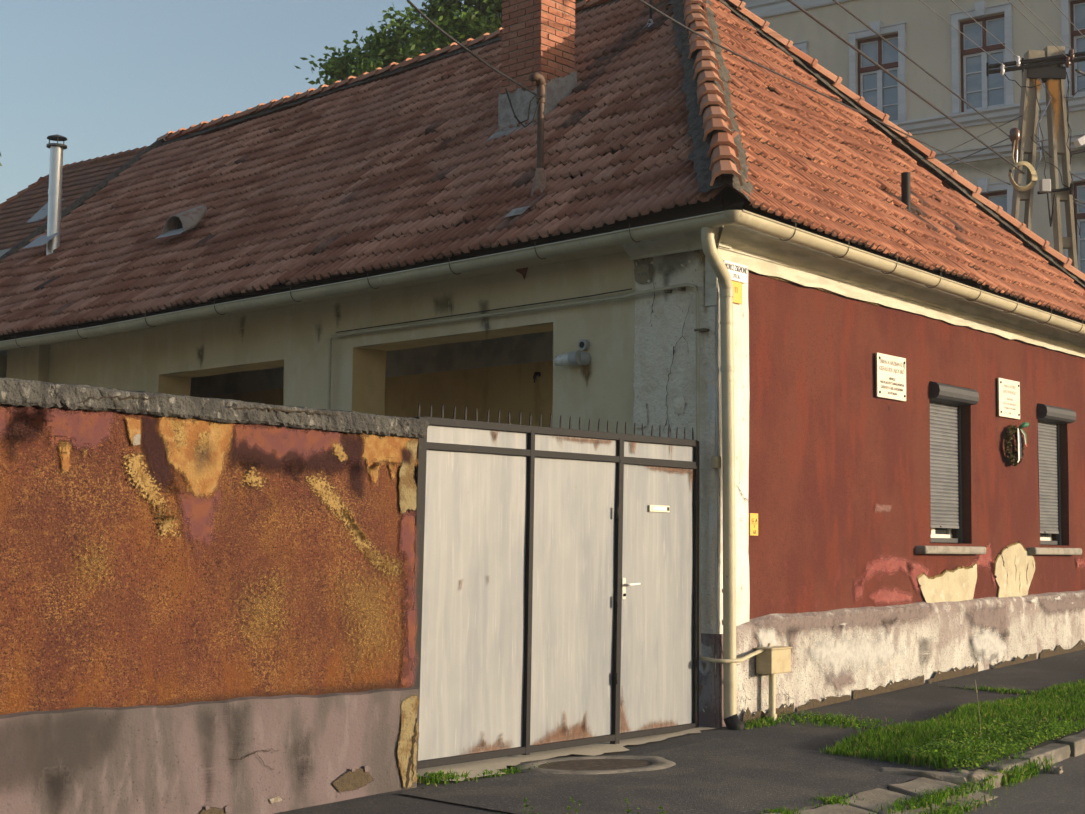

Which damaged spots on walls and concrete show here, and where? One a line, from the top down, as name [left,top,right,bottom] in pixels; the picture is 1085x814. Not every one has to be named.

crack [663,301,692,430]
water stain [5,406,47,458]
water stain [122,417,221,545]
spalling [158,417,348,497]
water stain [230,425,404,587]
efflorescence [758,630,777,647]
water stain [813,631,900,675]
peeling [759,541,1085,669]
efflorescence [974,630,1007,663]
corrosion [534,715,591,745]